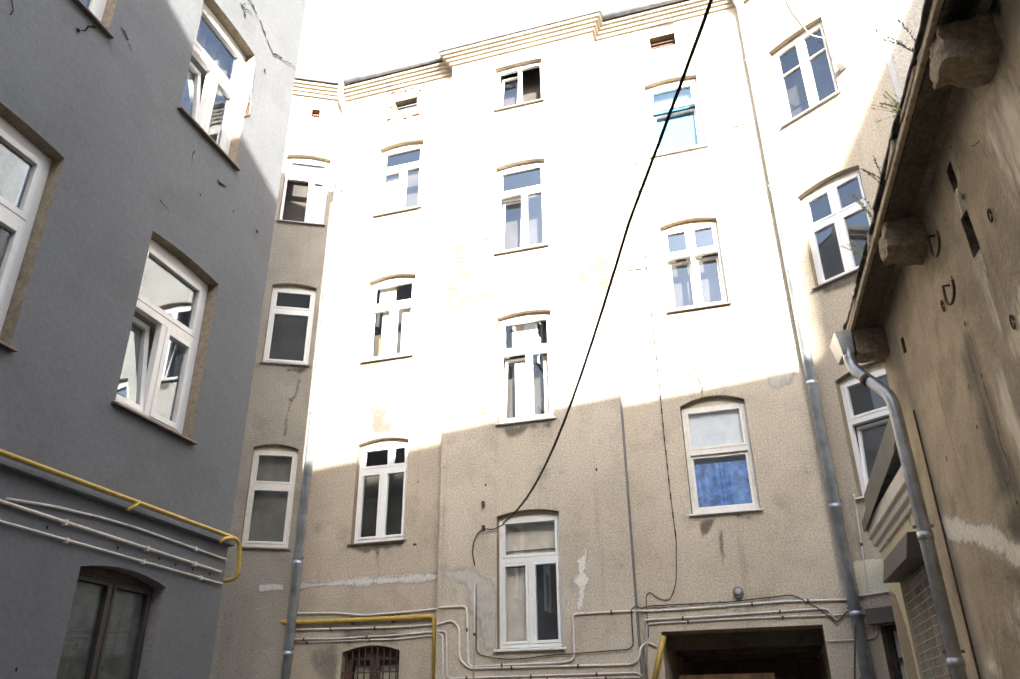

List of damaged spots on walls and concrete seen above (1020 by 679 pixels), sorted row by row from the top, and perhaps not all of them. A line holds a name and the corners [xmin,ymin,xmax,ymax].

flaking render [387,84,422,124]
flaking render [573,240,611,293]
water stain [356,362,394,436]
peeling [567,546,589,612]